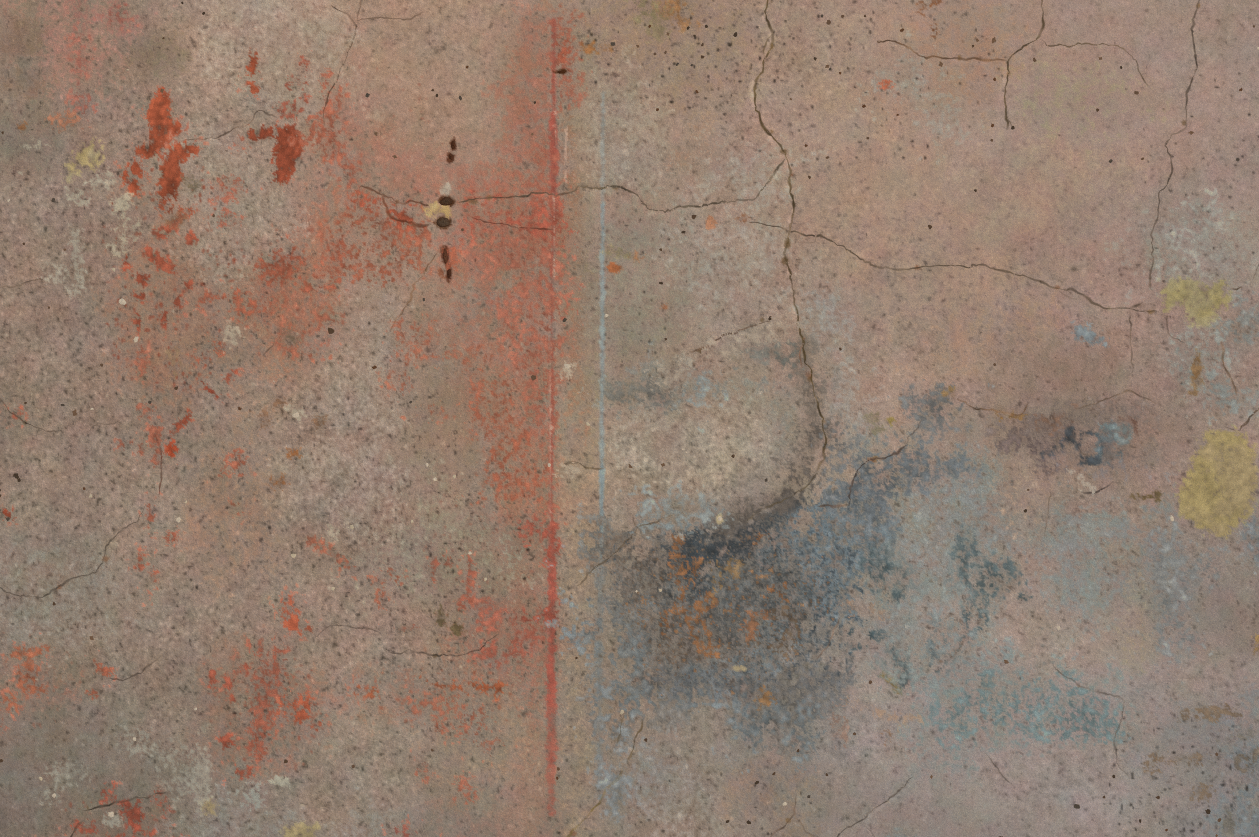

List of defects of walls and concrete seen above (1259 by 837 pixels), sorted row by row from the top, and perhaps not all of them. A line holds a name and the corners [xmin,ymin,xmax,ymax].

crack [323,0,423,127]
crack [360,186,439,331]
crack [459,0,1200,559]
crack [1220,340,1259,431]